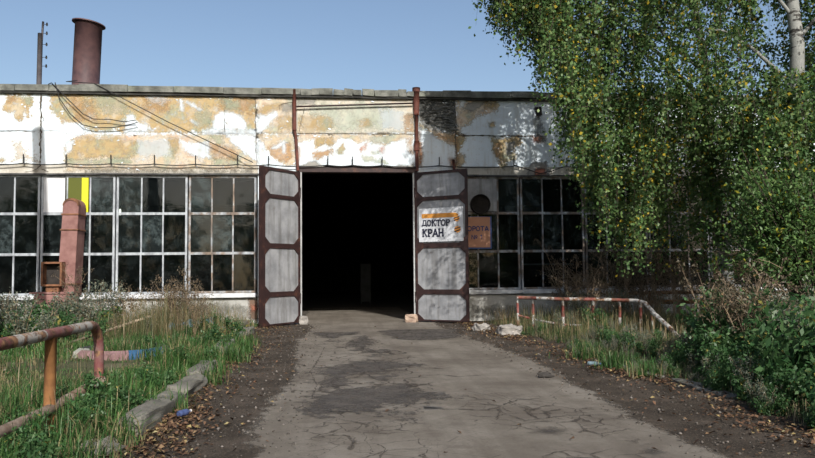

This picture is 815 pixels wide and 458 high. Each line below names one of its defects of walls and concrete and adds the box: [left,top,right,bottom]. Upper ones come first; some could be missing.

peeling [2,93,35,121]
peeling [46,94,523,172]